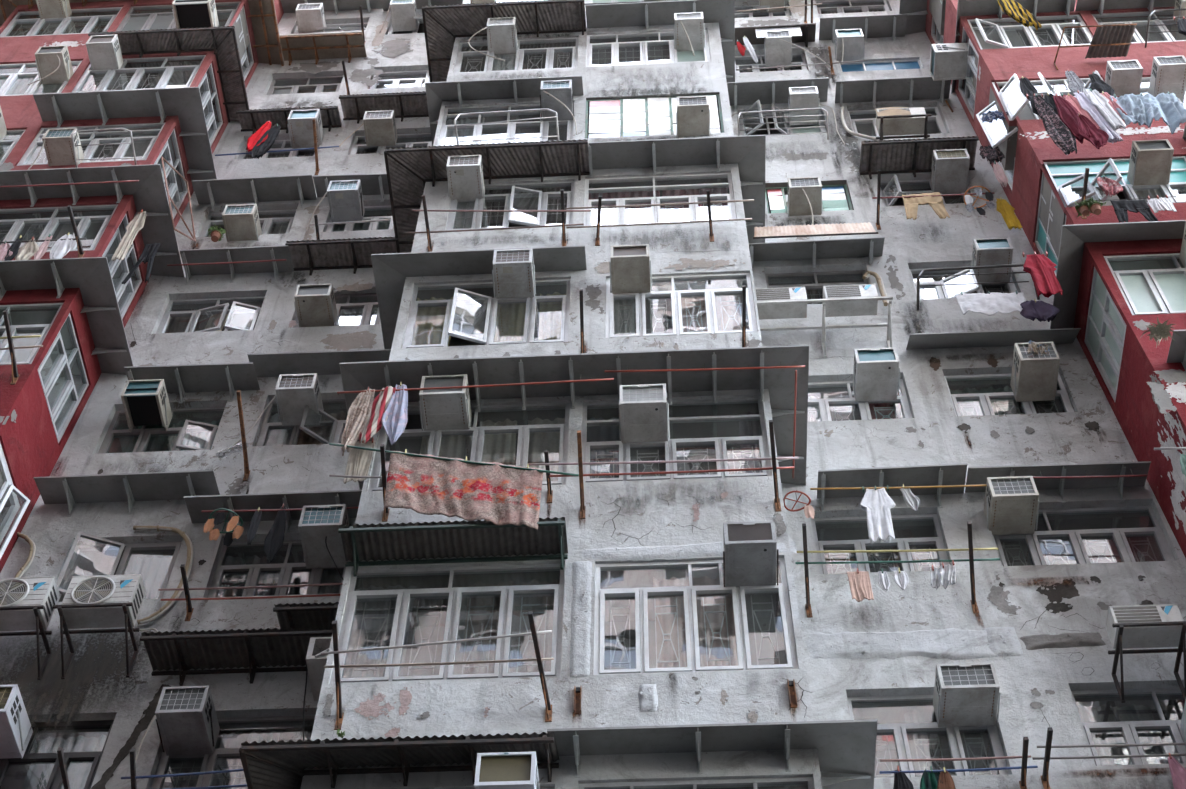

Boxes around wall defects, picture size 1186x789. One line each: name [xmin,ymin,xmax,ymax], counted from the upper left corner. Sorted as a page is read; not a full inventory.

peeling [1146,369,1186,534]
crack [601,495,710,546]
peeling [354,687,430,737]